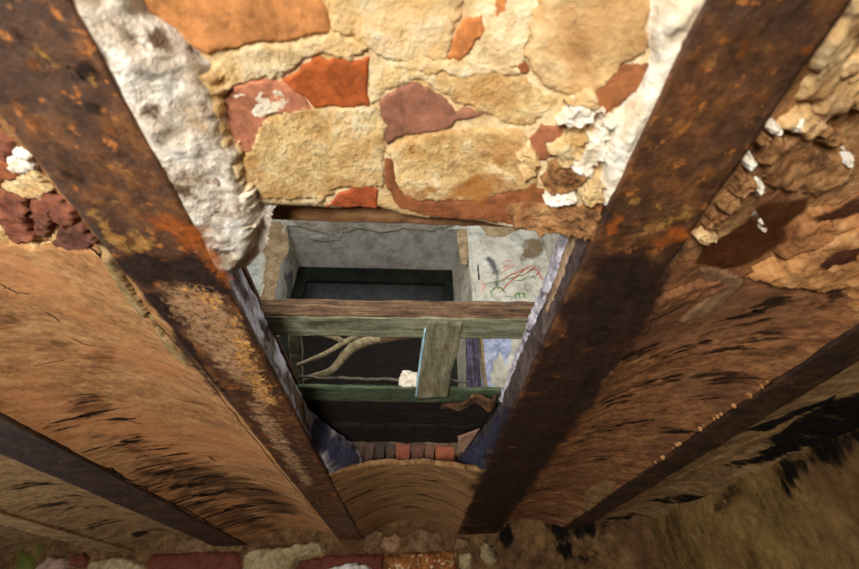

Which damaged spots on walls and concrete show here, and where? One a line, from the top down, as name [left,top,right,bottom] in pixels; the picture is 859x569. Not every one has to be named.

rust [88,209,153,253]
rust [153,217,225,282]
rust [645,206,690,246]
flaking render [652,193,859,324]